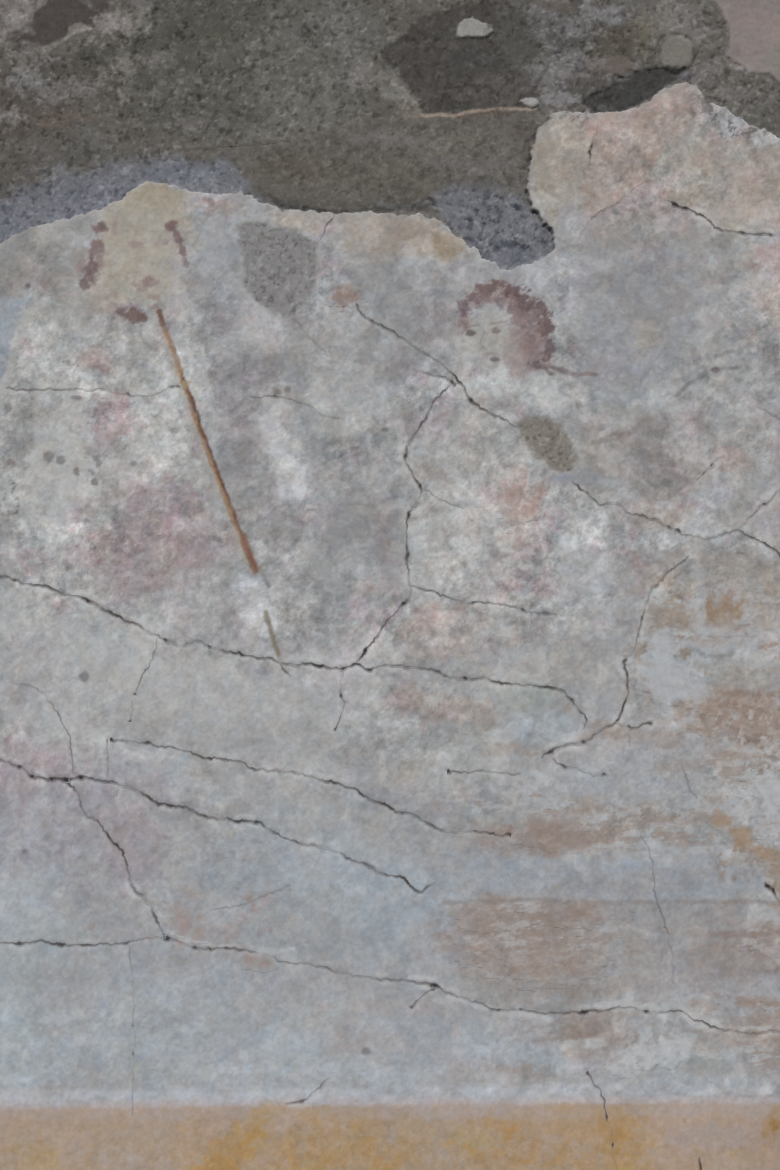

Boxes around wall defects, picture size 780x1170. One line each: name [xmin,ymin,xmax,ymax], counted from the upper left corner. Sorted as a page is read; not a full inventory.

flaking render [0,0,780,270]
spalling [238,223,368,318]
crack [0,302,780,1115]
crack [586,1070,618,1170]